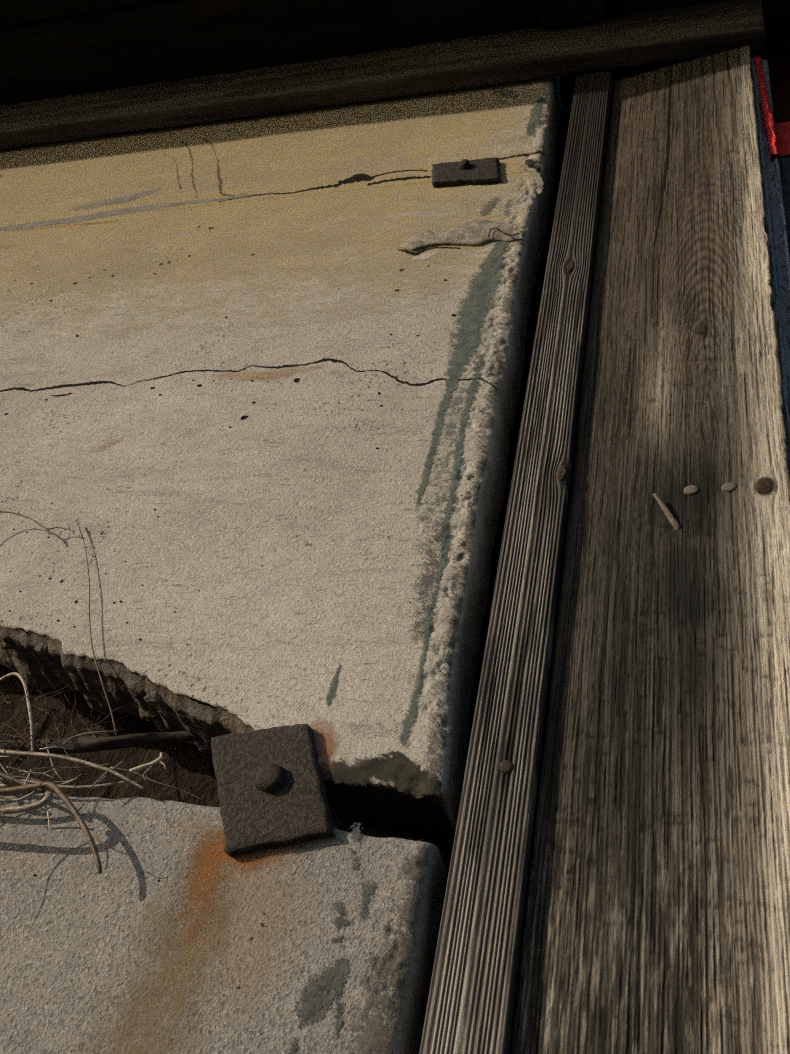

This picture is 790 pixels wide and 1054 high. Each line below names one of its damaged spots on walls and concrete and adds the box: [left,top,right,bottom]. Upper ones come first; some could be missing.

damp [0,83,548,315]
crack [168,137,430,202]
spalling [398,219,522,271]
crack [498,148,550,160]
crack [0,358,500,396]
damp [413,250,522,780]
spalling [0,610,254,755]
damp [343,843,429,1054]